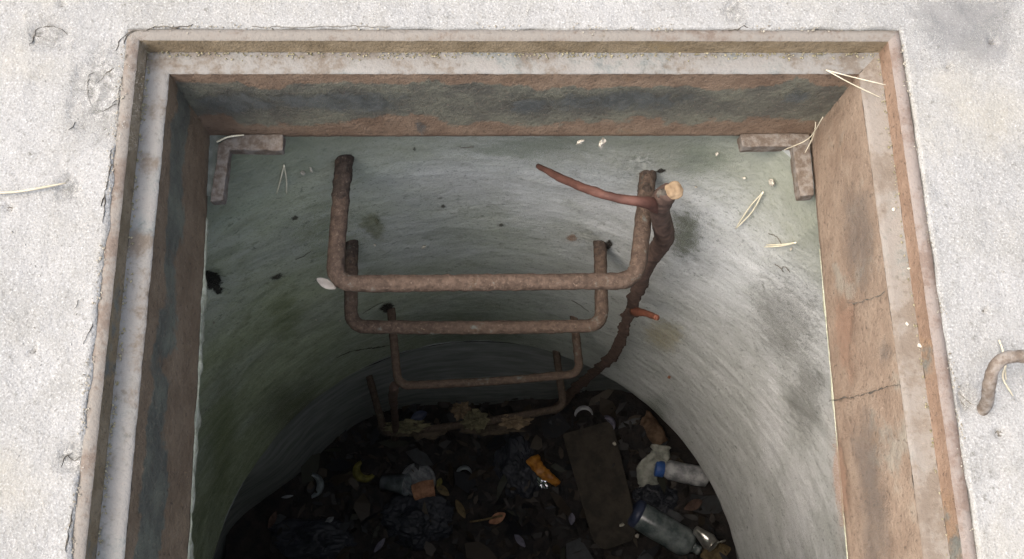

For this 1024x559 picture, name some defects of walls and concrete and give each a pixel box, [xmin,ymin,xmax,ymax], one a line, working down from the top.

corrosion [331,154,354,204]
corrosion [637,169,657,193]
corrosion [345,239,359,267]
corrosion [593,239,608,256]
crack [828,385,897,402]